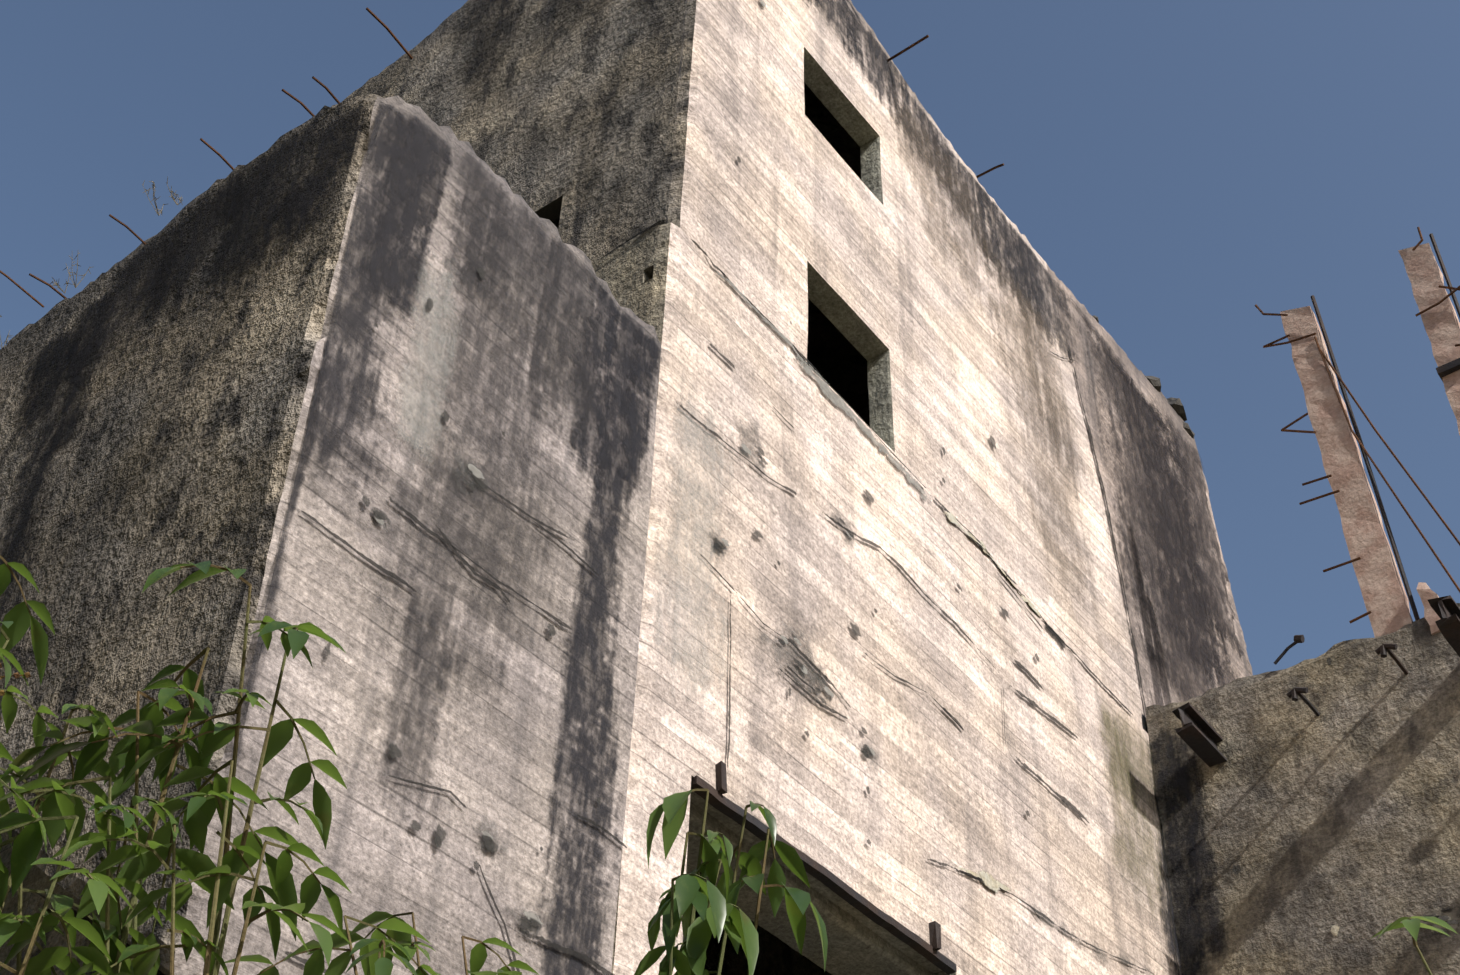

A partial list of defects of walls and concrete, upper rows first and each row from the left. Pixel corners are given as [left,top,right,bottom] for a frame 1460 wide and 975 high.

water stain [0,102,662,975]
water stain [808,0,1249,701]
water stain [1149,729,1225,975]